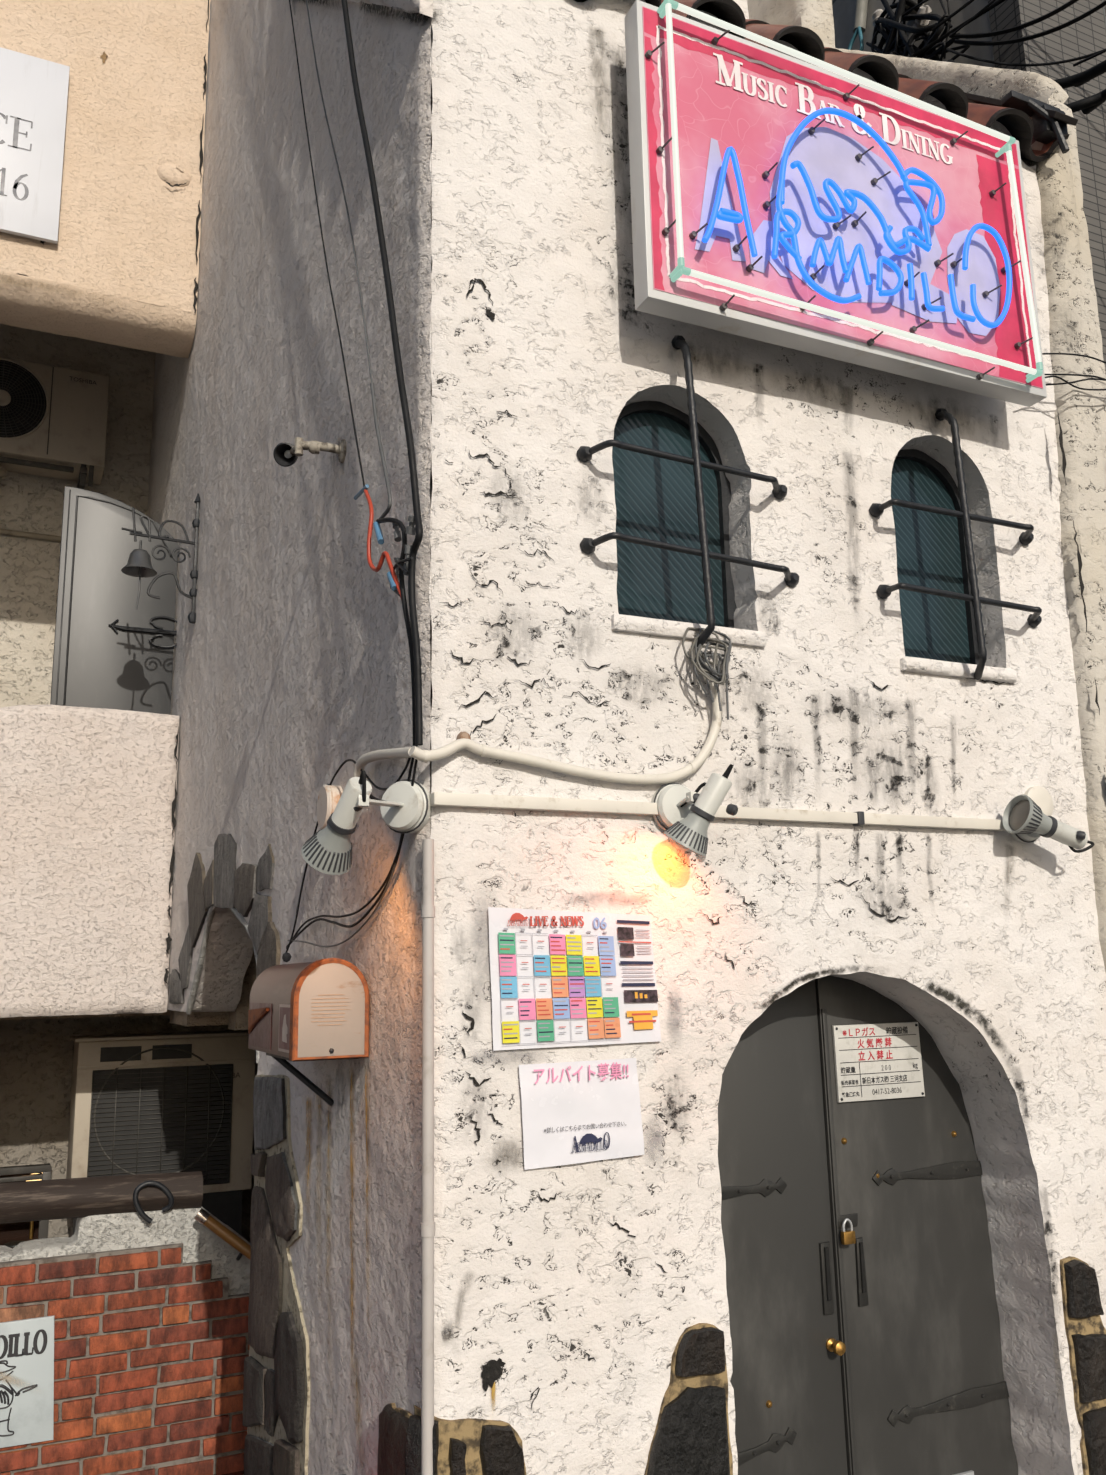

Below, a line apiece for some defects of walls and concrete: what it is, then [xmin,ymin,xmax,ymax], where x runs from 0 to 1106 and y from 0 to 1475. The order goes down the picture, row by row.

damp [757,704,800,775]
damp [812,696,858,763]
damp [872,736,931,798]
damp [873,836,905,917]
corrosion [350,1076,368,1325]